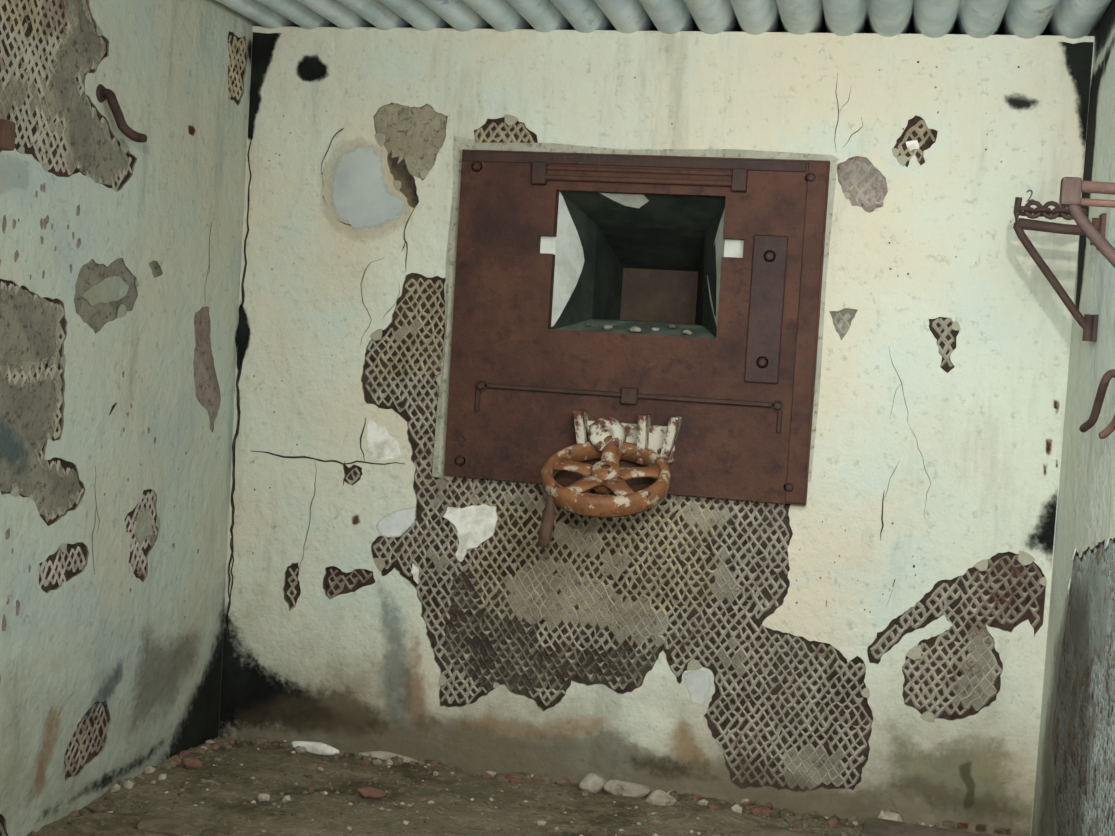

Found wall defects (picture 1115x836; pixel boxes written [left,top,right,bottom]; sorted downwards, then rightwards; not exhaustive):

spalling [0,0,135,198]
spalling [374,103,448,208]
spalling [892,116,938,167]
flaking render [40,215,56,251]
spalling [149,261,161,277]
spalling [0,258,139,525]
spalling [6,515,87,593]
spalling [324,273,1047,792]
flaking render [2,586,20,631]
spalling [64,701,109,779]
leakage [85,600,380,791]
spalling [1053,537,1115,836]